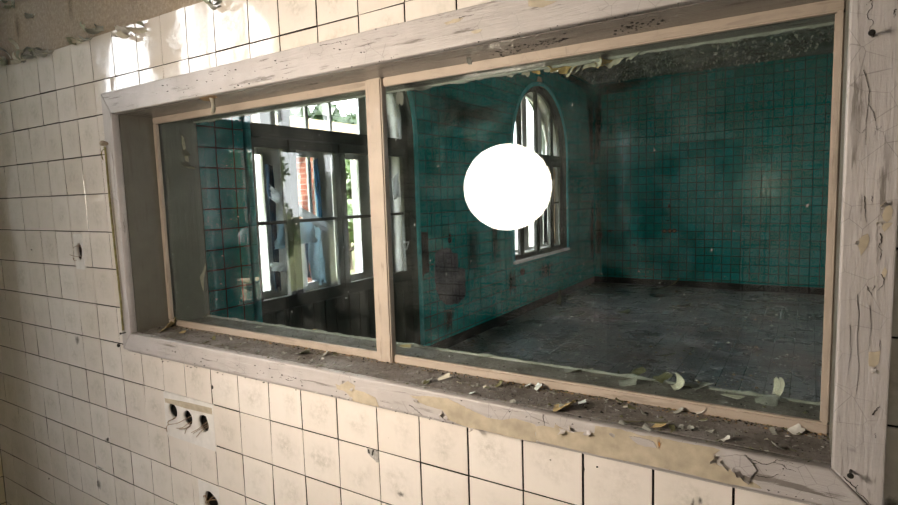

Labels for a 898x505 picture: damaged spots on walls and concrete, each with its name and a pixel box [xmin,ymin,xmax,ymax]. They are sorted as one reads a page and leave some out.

peeling [66,21,147,45]
peeling [507,27,834,88]
peeling [421,232,466,305]
peeling [331,381,379,408]
peeling [671,372,713,391]
peeling [721,377,787,406]
spalling [367,448,379,462]
peeling [391,395,813,500]